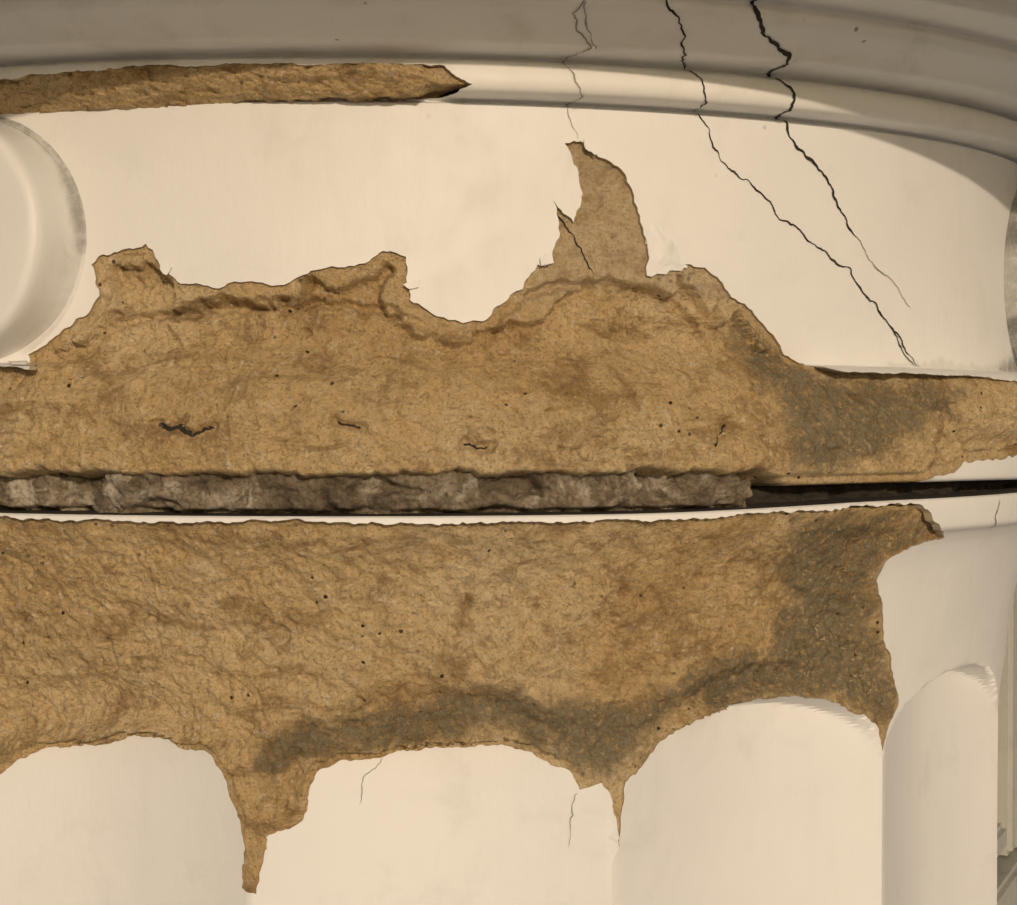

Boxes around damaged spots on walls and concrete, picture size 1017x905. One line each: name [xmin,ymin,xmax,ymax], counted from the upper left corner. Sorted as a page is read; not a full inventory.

spalling [0,62,472,115]
spalling [0,139,1017,486]
crack [562,0,597,138]
crack [665,0,918,366]
crack [0,469,1017,531]
spalling [0,503,944,894]